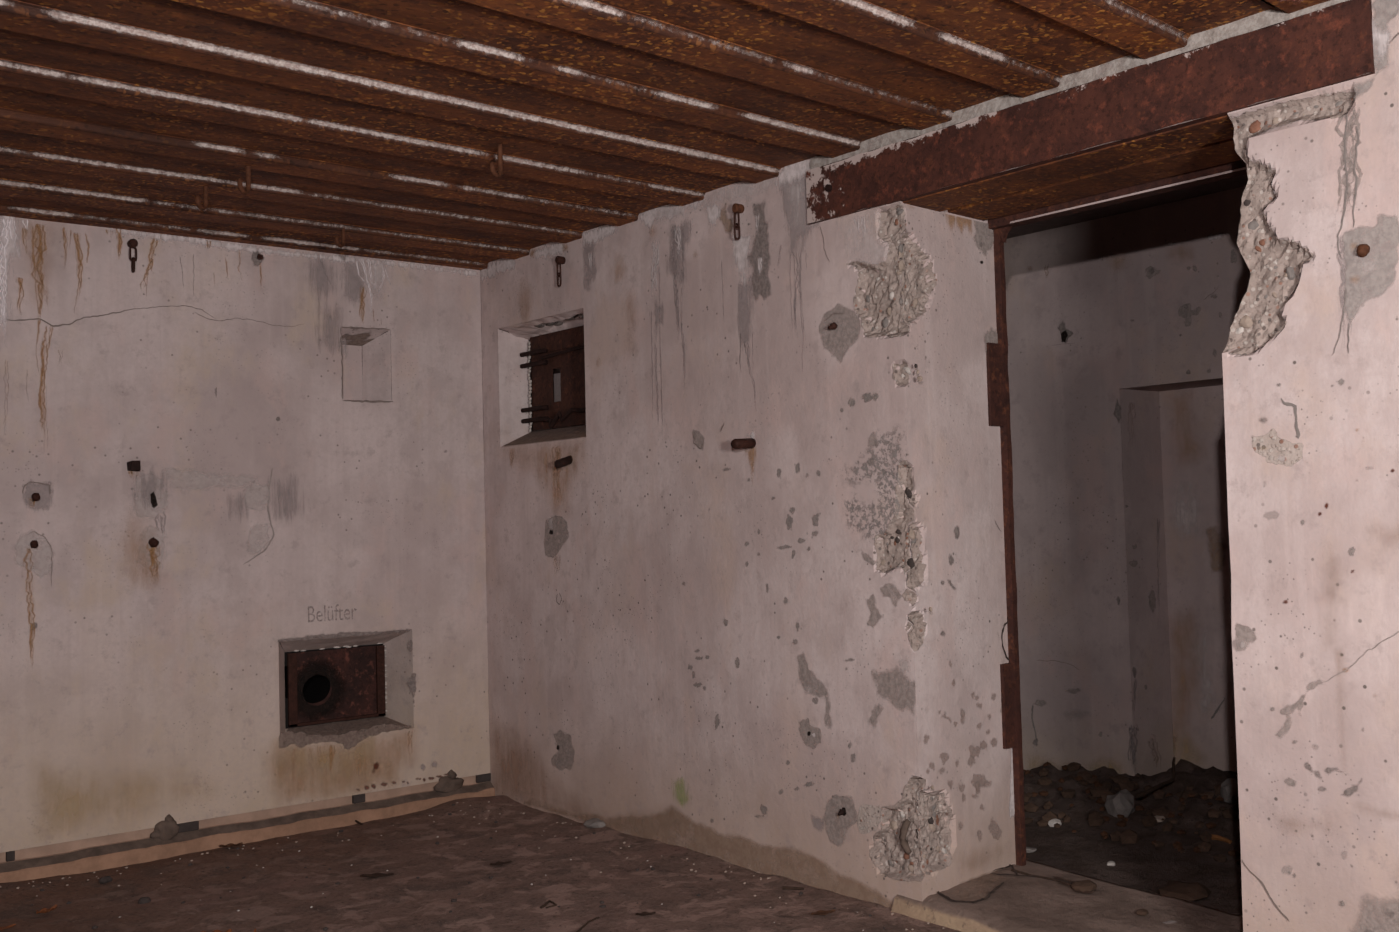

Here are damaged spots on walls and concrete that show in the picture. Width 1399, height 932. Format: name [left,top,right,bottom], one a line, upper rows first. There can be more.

corrosion [18,225,47,304]
corrosion [63,229,89,297]
crack [5,255,301,327]
water stain [532,243,563,259]
water stain [583,224,614,288]
water stain [640,160,811,410]
spalling [819,203,937,361]
spalling [1179,91,1355,372]
corrosion [37,321,51,416]
crack [340,326,393,403]
spalling [846,432,945,725]
crack [1325,631,1399,682]